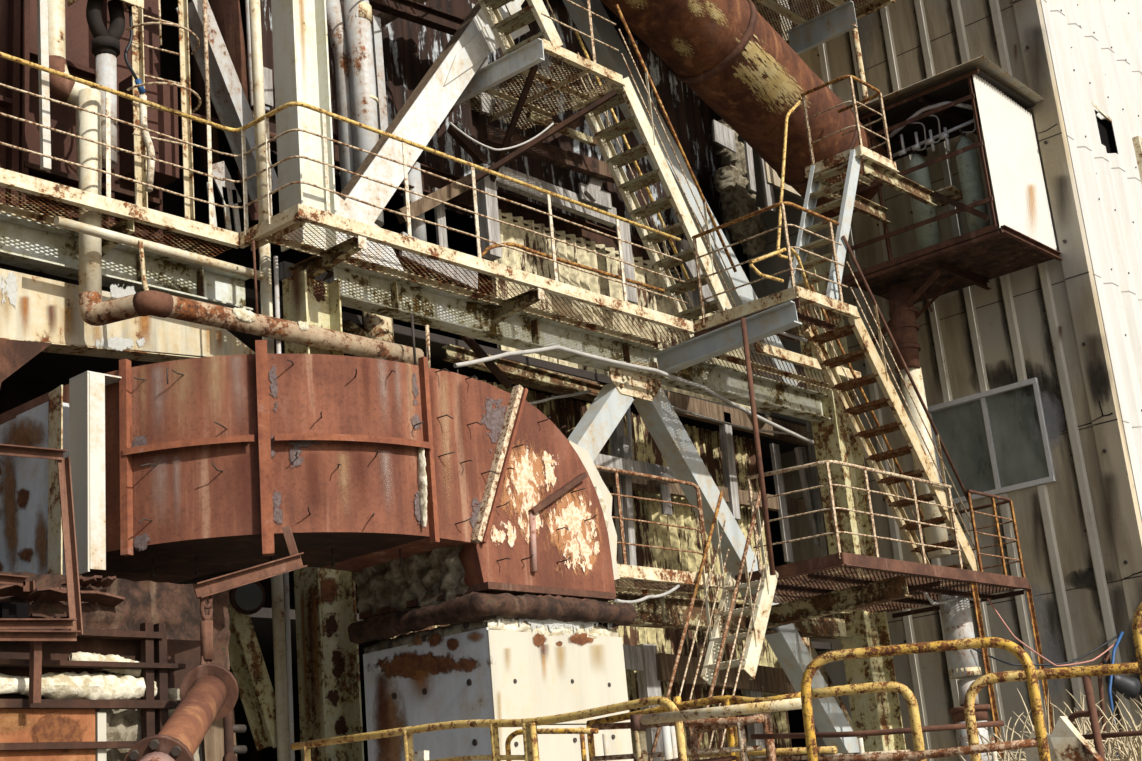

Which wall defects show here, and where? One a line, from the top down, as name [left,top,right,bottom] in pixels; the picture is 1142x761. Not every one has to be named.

peeling [686,0,729,26]
peeling [732,34,810,116]
peeling [0,271,18,308]
leakage [922,300,940,381]
leakage [958,265,1085,526]
leakage [1090,338,1110,400]
rust [0,421,48,571]
peeling [490,444,602,575]
rust [533,633,598,668]
rust [0,712,85,753]
rust [368,632,492,761]
leakage [1107,684,1124,739]